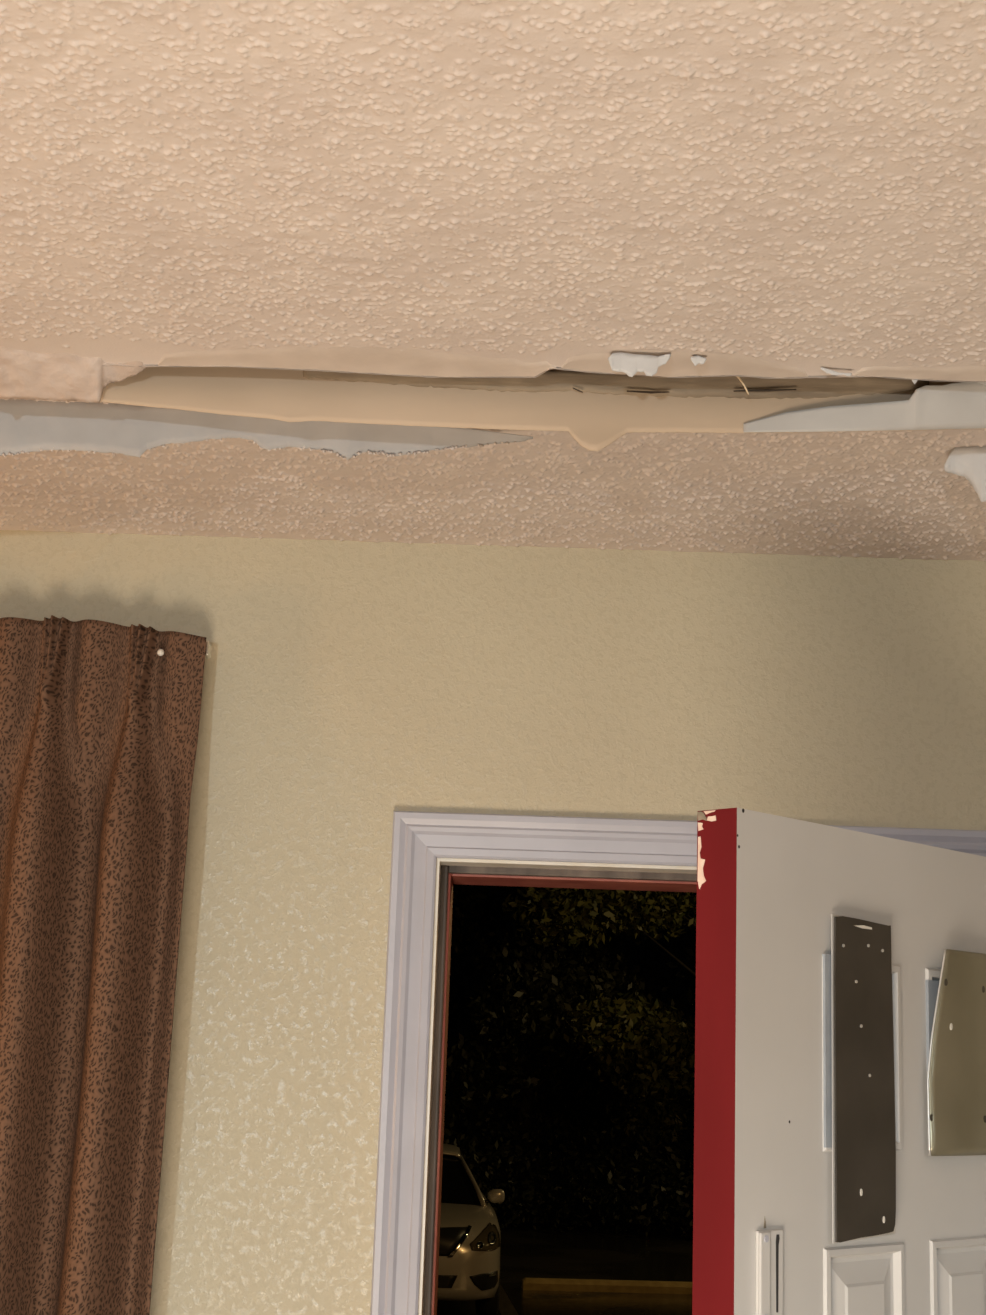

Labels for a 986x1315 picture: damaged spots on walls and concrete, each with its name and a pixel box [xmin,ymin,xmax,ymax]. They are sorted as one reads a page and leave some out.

crack [103,363,986,395]
peeling [158,346,986,384]